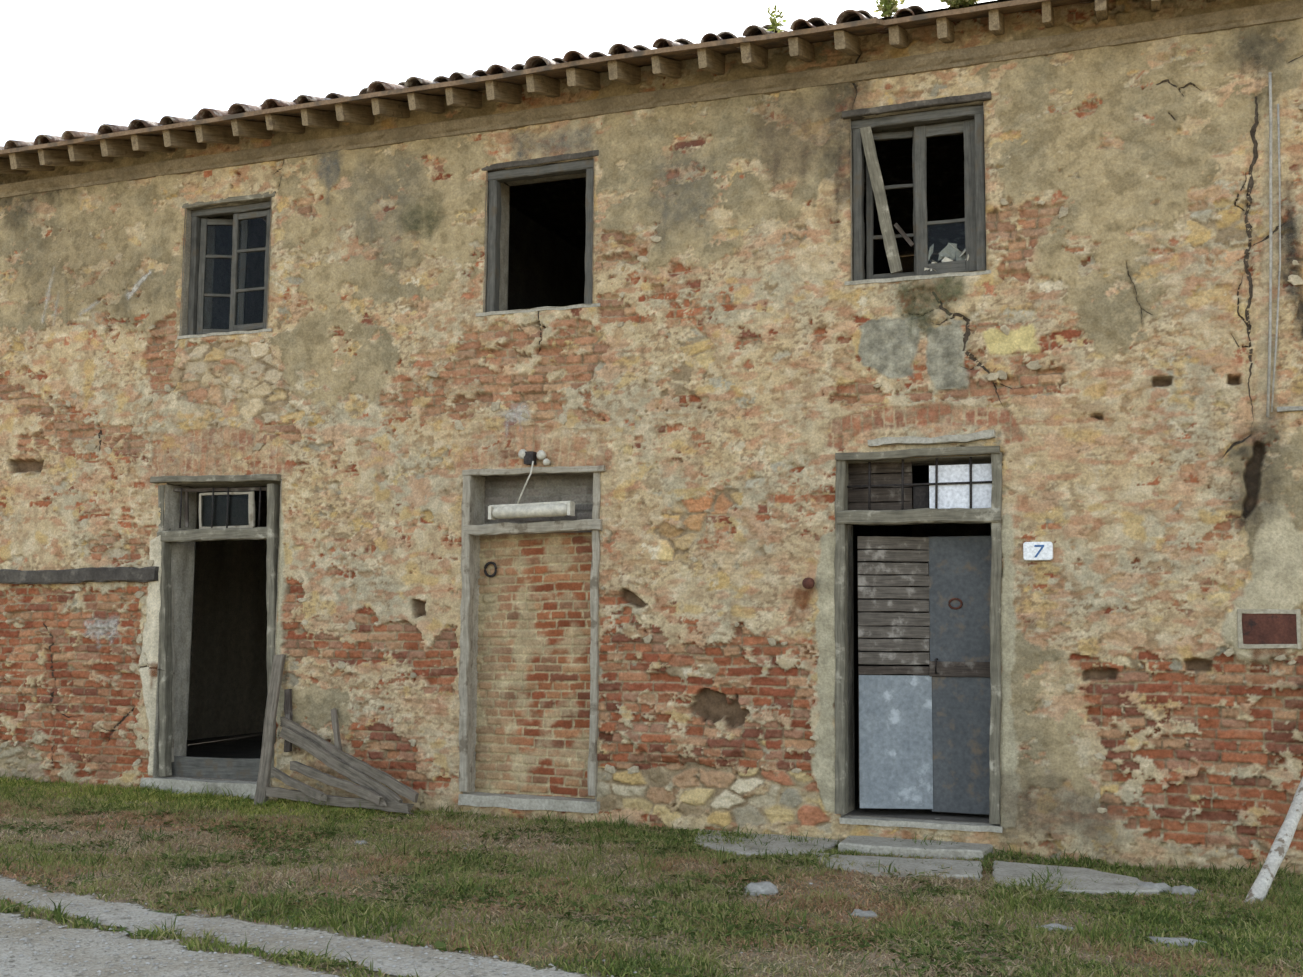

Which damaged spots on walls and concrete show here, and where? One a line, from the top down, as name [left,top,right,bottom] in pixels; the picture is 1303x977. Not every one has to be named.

crack [1156,79,1200,120]
spalling [375,292,636,430]
spalling [823,316,1071,414]
crack [1223,96,1288,457]
spalling [1287,255,1303,354]
spalling [0,531,154,785]
spalling [281,574,460,696]
spalling [344,723,451,792]
spalling [596,586,832,829]
spalling [1061,646,1303,870]